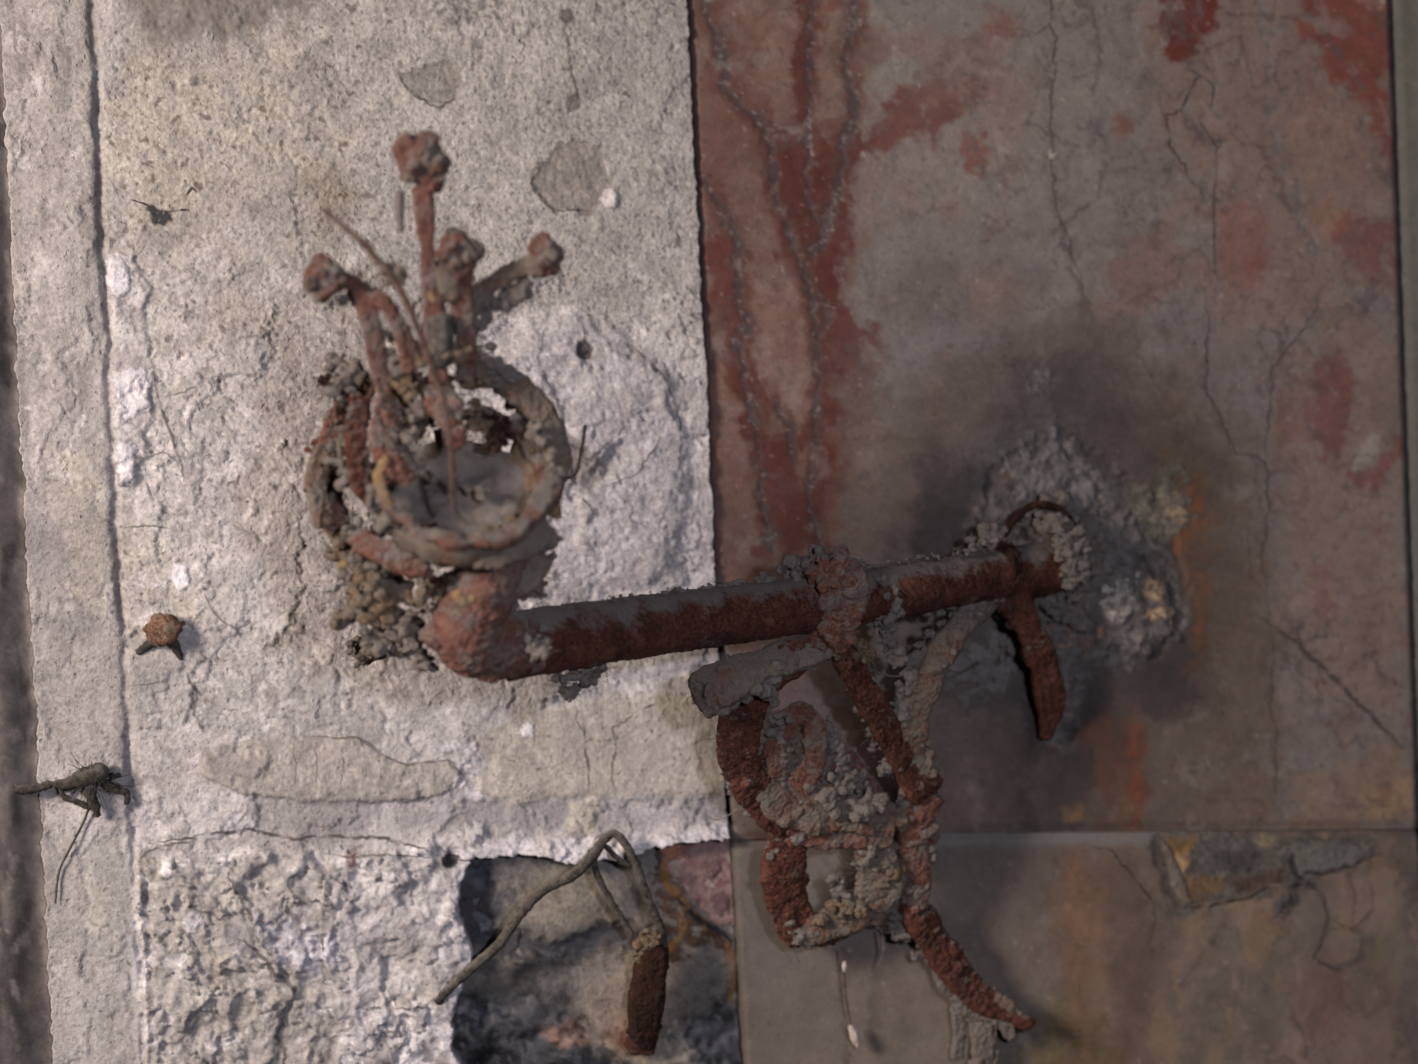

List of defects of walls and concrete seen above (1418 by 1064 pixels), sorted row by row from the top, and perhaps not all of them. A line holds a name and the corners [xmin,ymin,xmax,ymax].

damp [129,0,306,41]
crack [1014,0,1093,320]
crack [1165,58,1403,806]
rust [652,862,735,1000]
spalling [1149,831,1376,918]